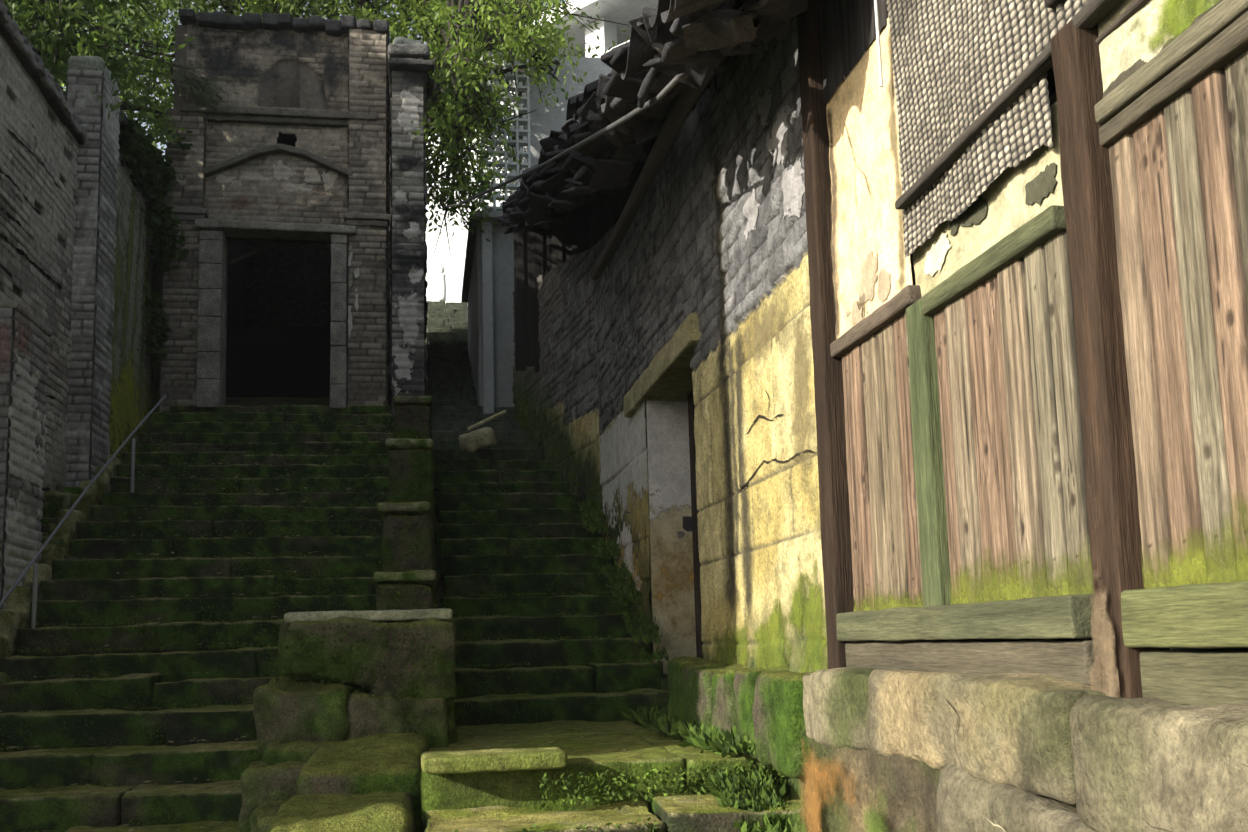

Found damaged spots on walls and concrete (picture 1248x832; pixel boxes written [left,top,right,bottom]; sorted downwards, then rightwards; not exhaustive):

peeling [1103,59,1146,98]
spalling [397,89,421,143]
spalling [394,190,408,201]
peeling [1003,146,1056,205]
spalling [402,221,419,239]
peeling [917,194,987,276]
spalling [392,267,424,395]
leakage [712,151,815,610]
crack [745,390,784,435]
crack [739,449,812,493]
corrosion [800,754,853,832]